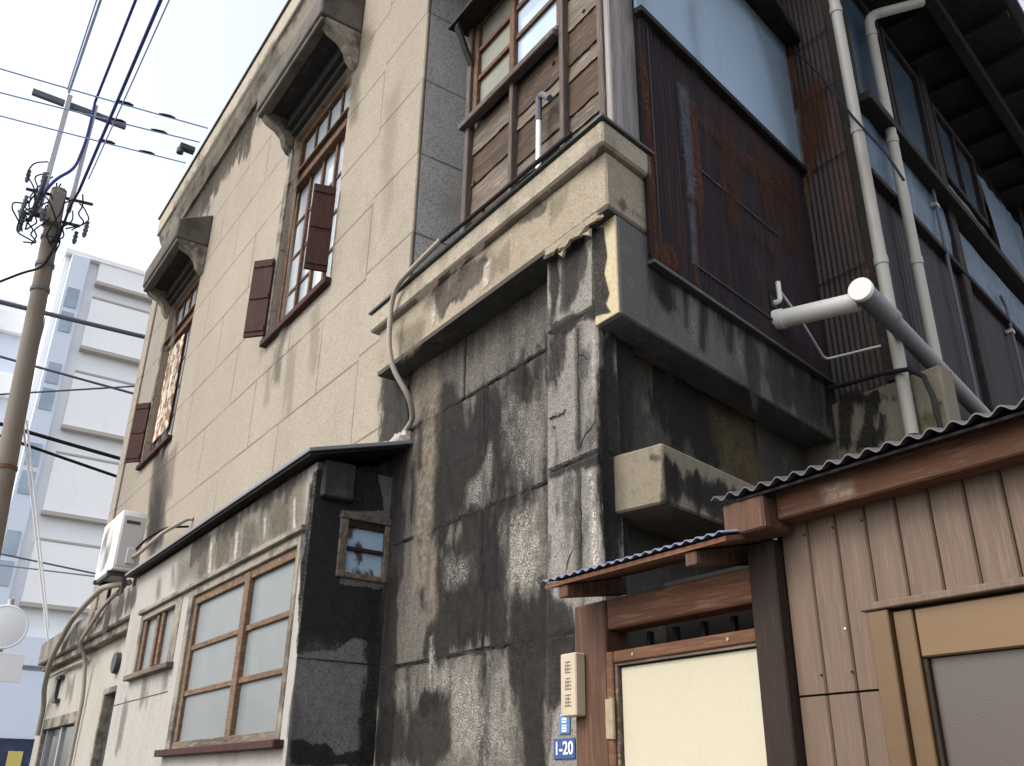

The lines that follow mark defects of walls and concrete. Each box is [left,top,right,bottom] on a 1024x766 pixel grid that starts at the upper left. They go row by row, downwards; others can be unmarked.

damp [185,107,260,218]
spalling [543,212,604,259]
corrosion [785,48,827,209]
damp [649,267,893,529]
damp [172,227,636,766]